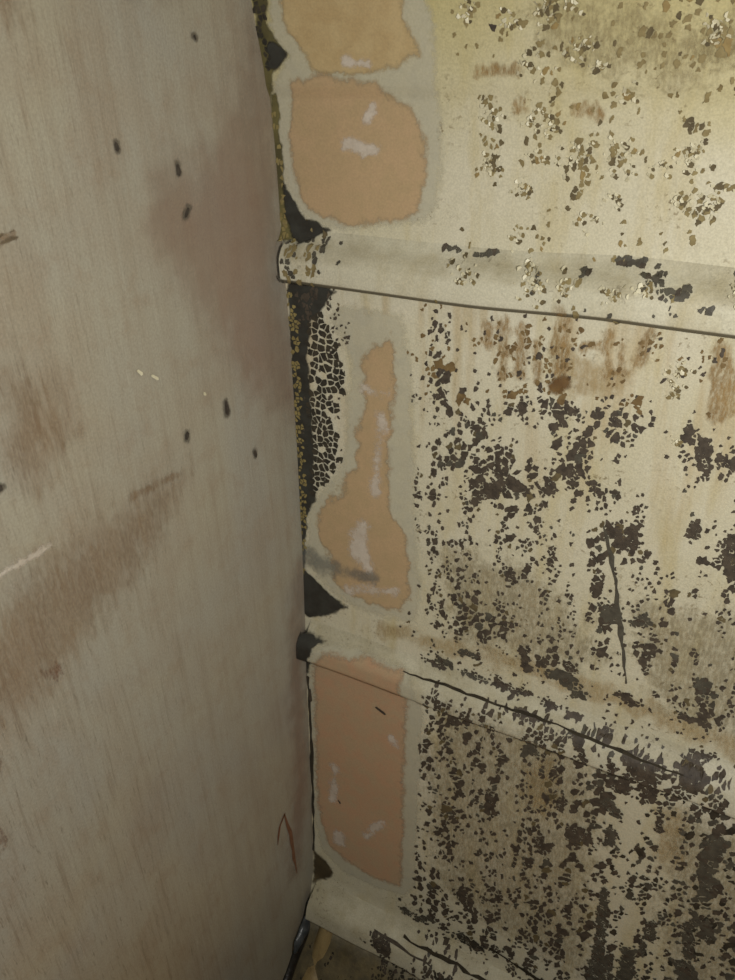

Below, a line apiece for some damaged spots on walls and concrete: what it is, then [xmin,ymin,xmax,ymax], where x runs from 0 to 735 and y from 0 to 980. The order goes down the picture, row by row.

peeling [451,0,480,28]
peeling [475,95,506,187]
peeling [489,0,735,246]
peeling [276,144,350,403]
peeling [363,192,735,980]
crack [403,671,684,776]
crack [374,929,486,980]
crack [489,948,541,980]